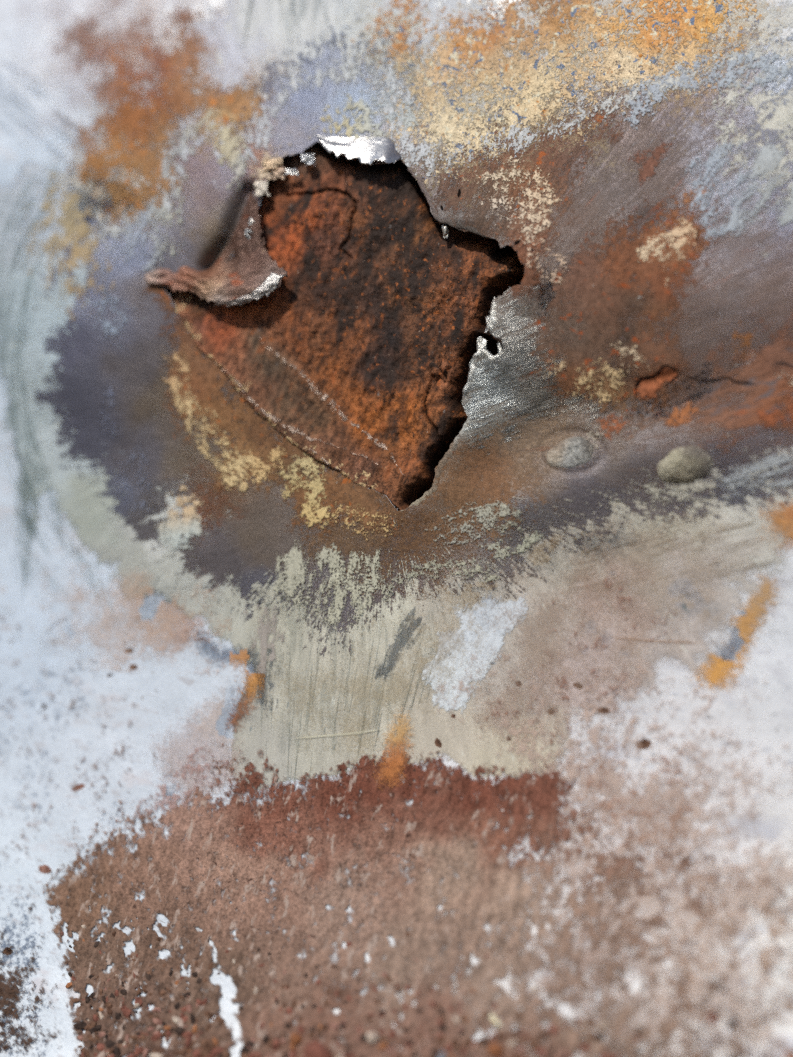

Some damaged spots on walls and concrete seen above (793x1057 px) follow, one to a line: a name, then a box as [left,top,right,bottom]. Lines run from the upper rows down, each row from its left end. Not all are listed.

rust [18,0,273,320]
peeling [0,0,793,790]
rust [141,0,793,600]
rust [696,576,779,688]